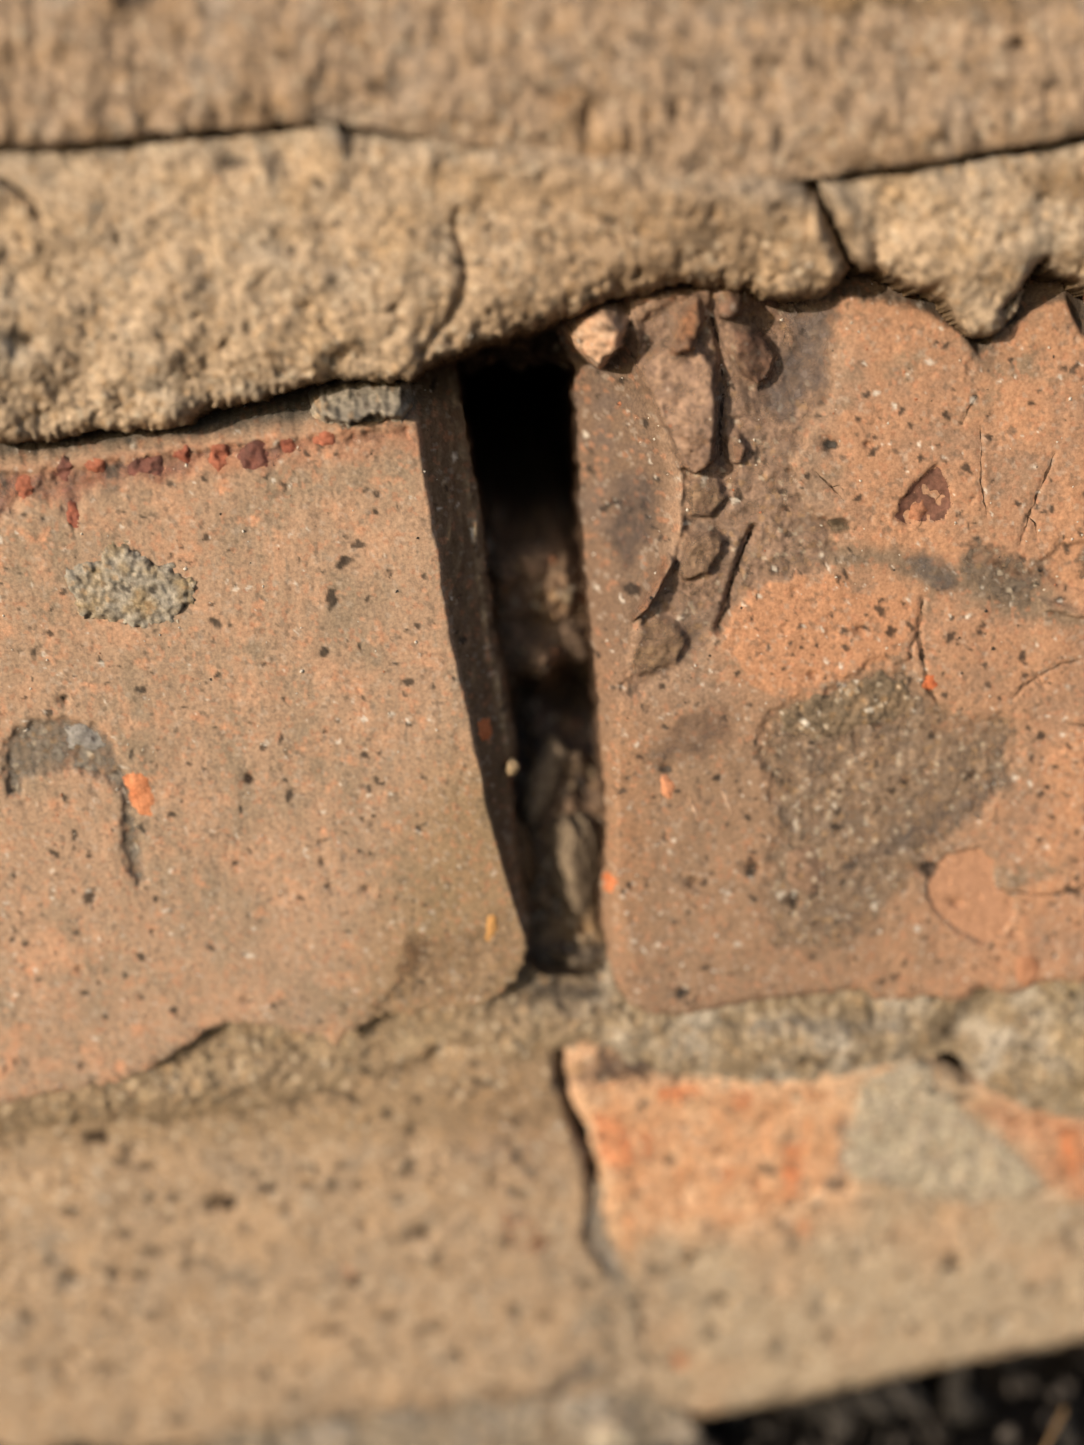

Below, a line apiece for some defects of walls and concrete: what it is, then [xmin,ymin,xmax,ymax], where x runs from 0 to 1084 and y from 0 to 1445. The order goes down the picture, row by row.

crack [0,120,391,215]
crack [809,133,1084,267]
crack [947,396,987,516]
crack [1019,453,1055,545]
crack [911,601,938,706]
crack [1012,660,1077,699]
crack [994,877,1084,896]
crack [557,1048,602,1179]